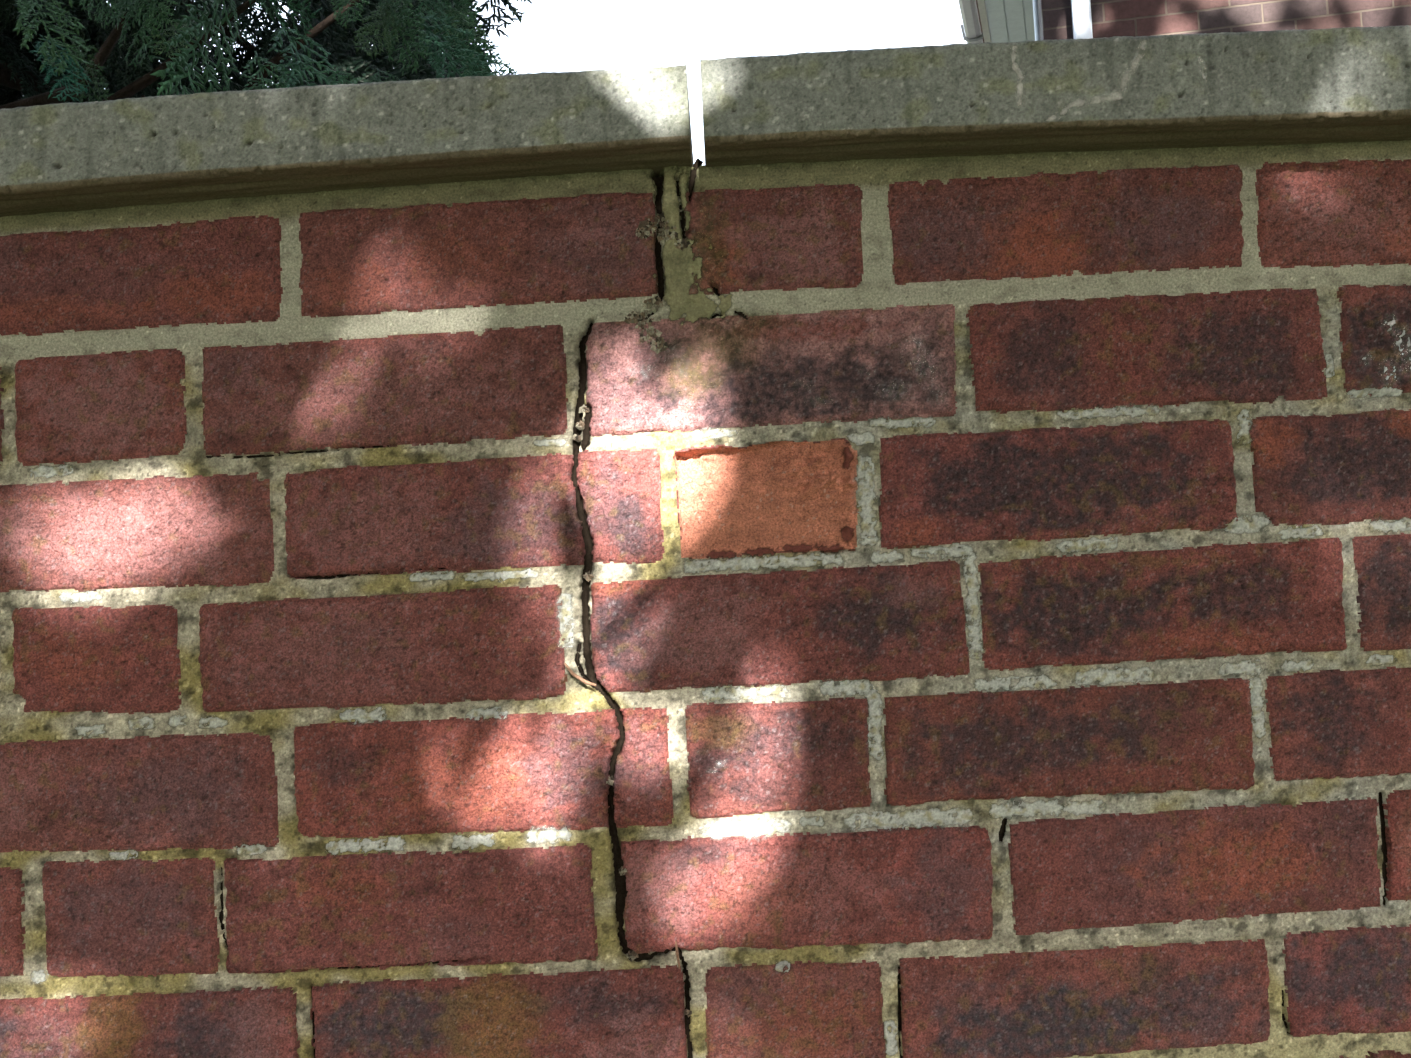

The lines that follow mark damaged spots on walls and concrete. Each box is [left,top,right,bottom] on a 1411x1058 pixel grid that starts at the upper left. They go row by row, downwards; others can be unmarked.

crack [648,158,704,318]
crack [571,322,693,1058]